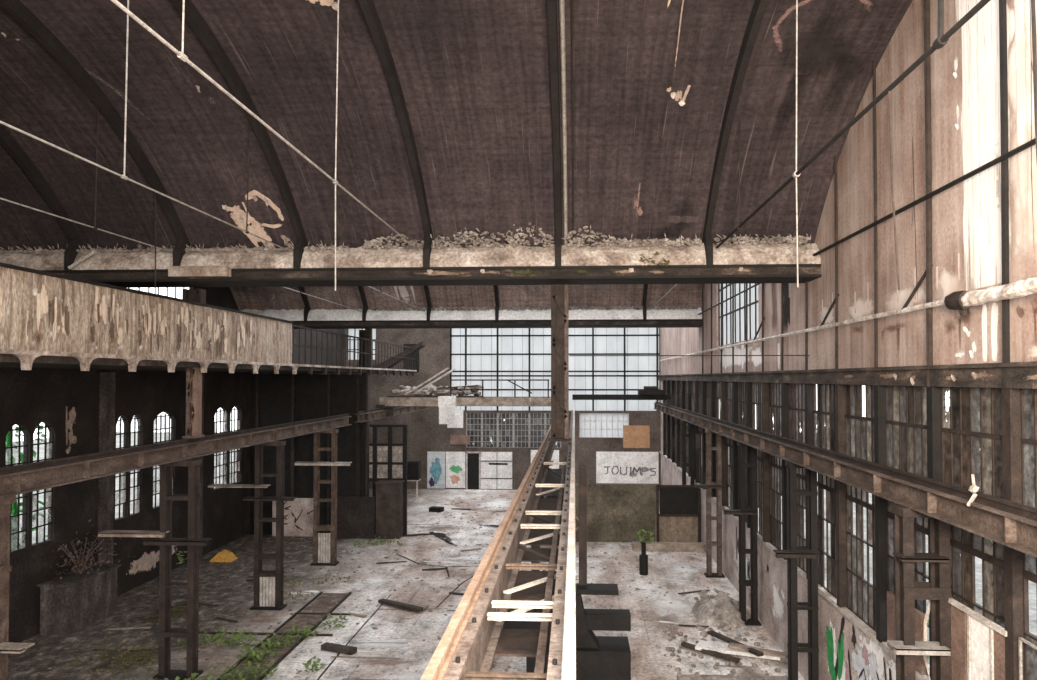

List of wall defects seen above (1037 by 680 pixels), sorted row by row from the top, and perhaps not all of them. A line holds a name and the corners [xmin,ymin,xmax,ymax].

spalling [309,0,338,11]
peeling [667,0,684,66]
peeling [666,81,691,106]
water stain [848,0,1037,319]
peeling [222,190,291,249]
peeling [25,278,69,347]
peeling [90,287,255,358]
peeling [66,406,77,454]
peeling [126,546,177,575]